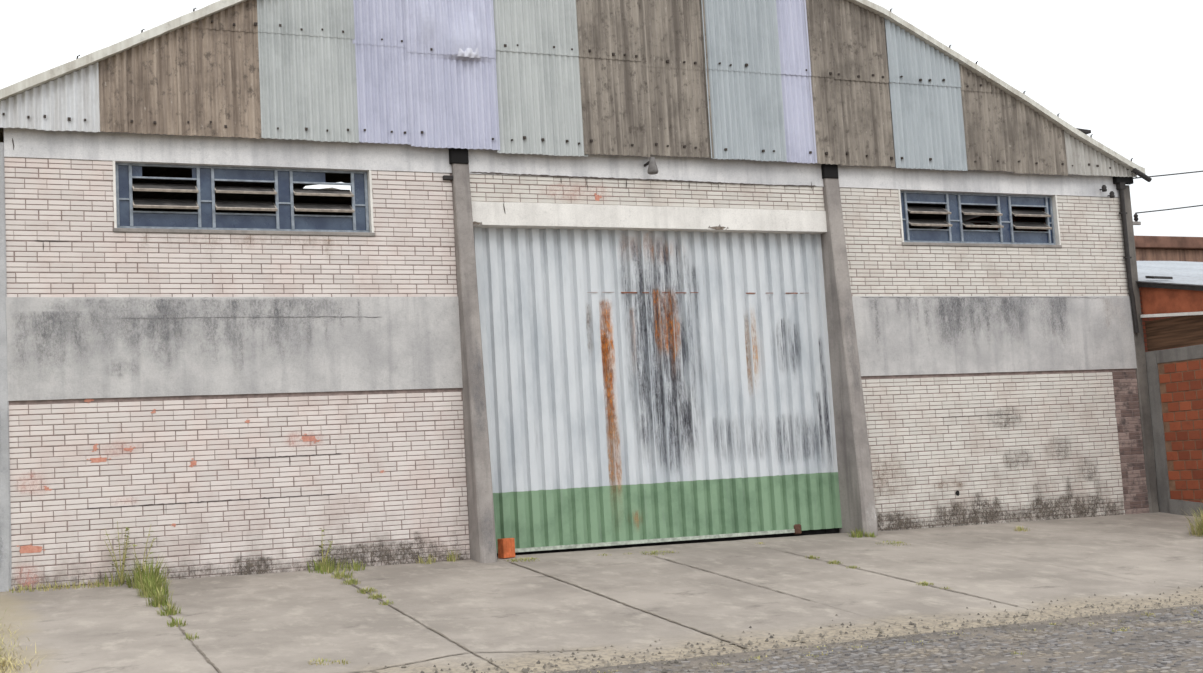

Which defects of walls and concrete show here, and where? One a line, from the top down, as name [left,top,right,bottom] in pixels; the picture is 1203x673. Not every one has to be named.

rust [652,290,681,360]
rust [601,304,622,483]
peeling [86,443,111,463]
damp [877,513,910,530]
damp [938,494,1001,526]
damp [1030,484,1099,519]
peeling [16,545,45,554]